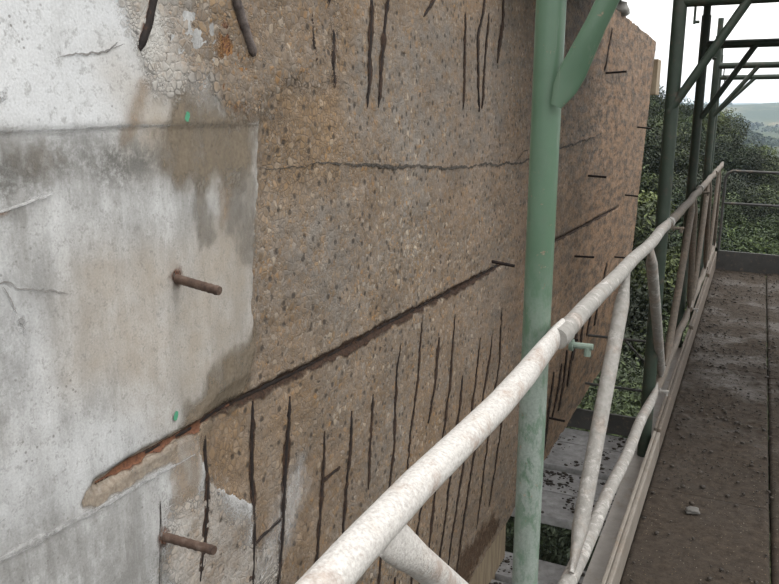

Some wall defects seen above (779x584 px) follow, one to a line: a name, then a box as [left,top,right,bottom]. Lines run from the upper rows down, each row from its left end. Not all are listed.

crack [56,42,123,59]
rust [220,24,249,72]
spalling [564,0,595,59]
water stain [160,90,261,254]
crack [258,150,529,173]
spalling [550,9,656,328]
crack [0,281,72,313]
spalling [82,0,536,584]
spalling [544,284,621,460]
rust [95,404,229,483]
water stain [174,328,256,500]